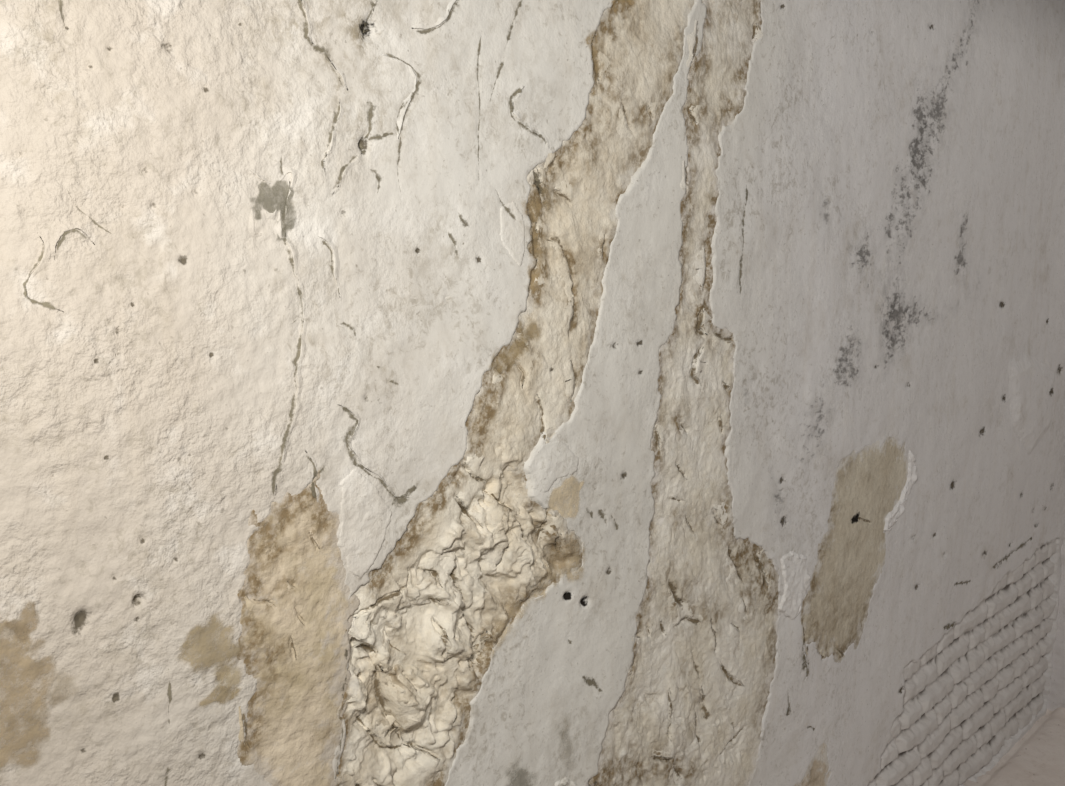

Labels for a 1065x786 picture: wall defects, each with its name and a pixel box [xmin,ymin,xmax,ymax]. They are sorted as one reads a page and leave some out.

crack [298,0,421,196]
crack [477,2,550,162]
damp [885,37,969,237]
crack [23,206,110,312]
crack [272,161,356,502]
crack [337,403,416,505]
flaking render [237,0,918,786]
damp [835,341,861,386]
damp [882,284,928,363]
damp [0,604,52,768]
damp [182,616,240,705]
flaking render [868,539,1057,786]